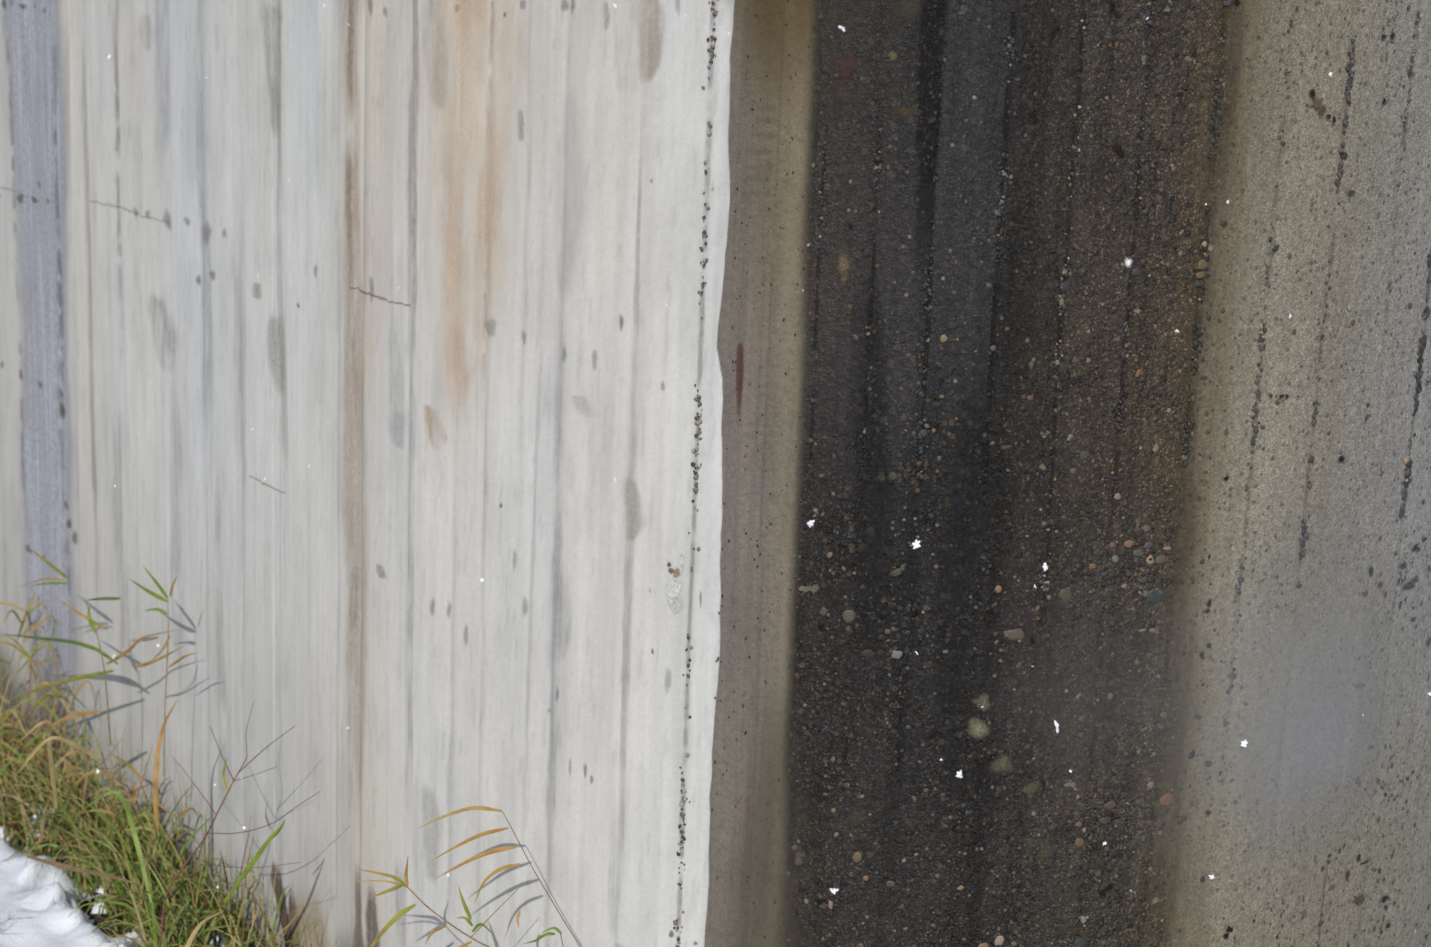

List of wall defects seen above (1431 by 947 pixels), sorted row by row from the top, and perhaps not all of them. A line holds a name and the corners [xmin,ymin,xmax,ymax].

crack [351,287,410,306]
water stain [705,0,1241,947]